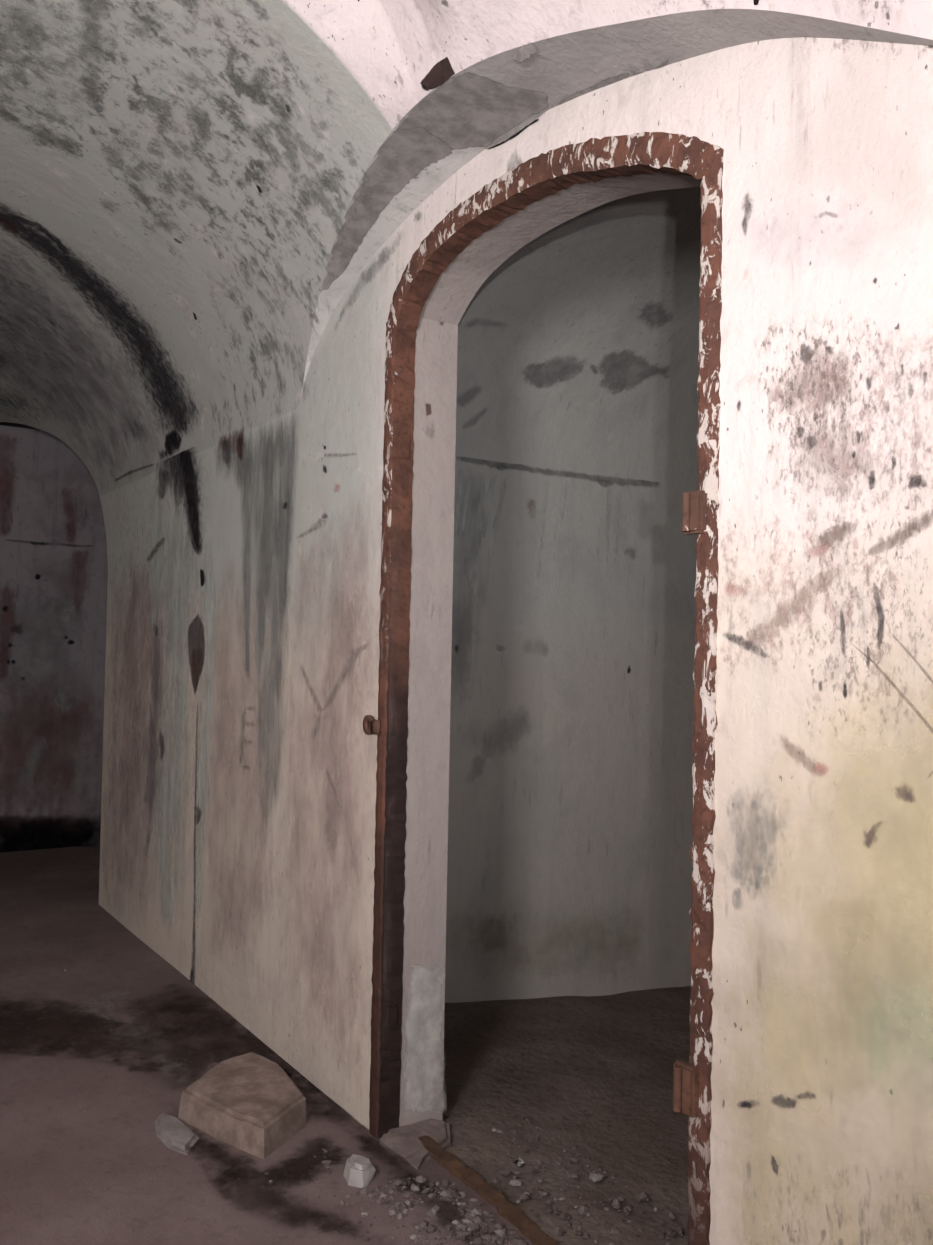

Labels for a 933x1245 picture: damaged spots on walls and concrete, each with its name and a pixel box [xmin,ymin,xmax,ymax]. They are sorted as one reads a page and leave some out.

water stain [227,426,294,742]